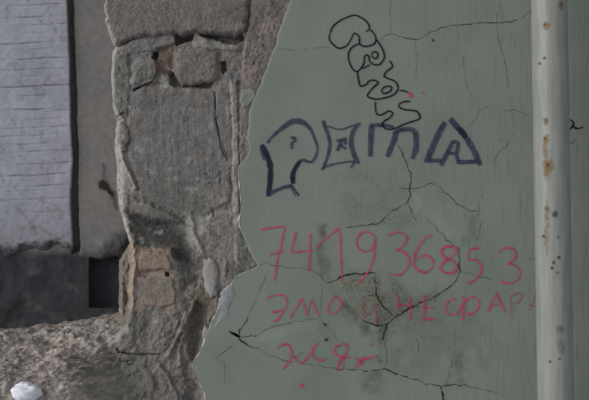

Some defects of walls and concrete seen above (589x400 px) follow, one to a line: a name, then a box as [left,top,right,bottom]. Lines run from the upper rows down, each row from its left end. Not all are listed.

crack [381,10,531,40]
spalling [98,0,290,400]
crack [259,146,491,340]
rust [543,135,553,176]
crack [221,279,493,400]